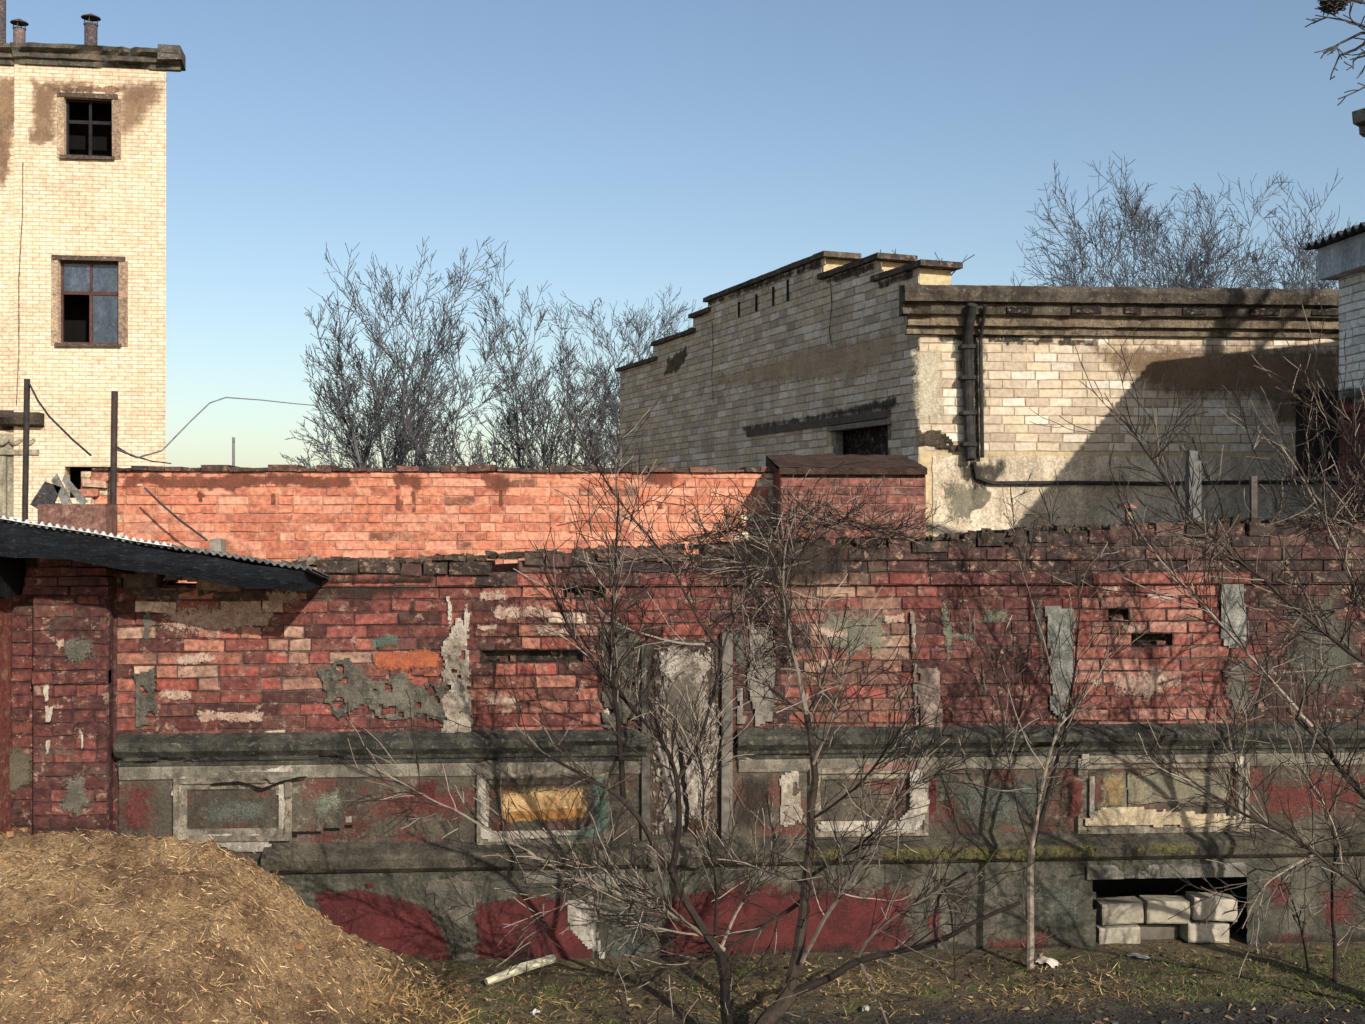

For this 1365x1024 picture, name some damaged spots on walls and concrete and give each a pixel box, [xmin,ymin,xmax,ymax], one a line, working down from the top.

leakage [121,82,158,131]
leakage [911,335,1365,523]
spalling [564,586,604,599]
flaking render [317,588,583,733]
flaking render [600,619,642,731]
peeling [43,685,53,722]
peeling [59,772,89,817]
peeling [315,818,707,961]
peeling [654,879,942,957]
peeling [987,931,1048,949]
peeling [1320,886,1356,925]